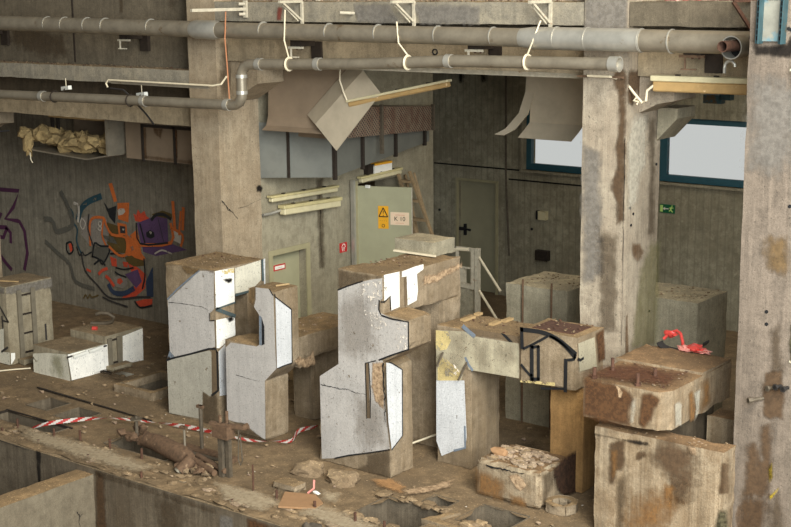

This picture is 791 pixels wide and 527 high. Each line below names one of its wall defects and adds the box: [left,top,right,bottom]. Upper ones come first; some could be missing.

damp [612,71,645,222]
damp [584,148,602,280]
damp [767,238,787,272]
corrosion [532,320,685,427]
damp [610,440,648,482]
damp [736,371,784,527]